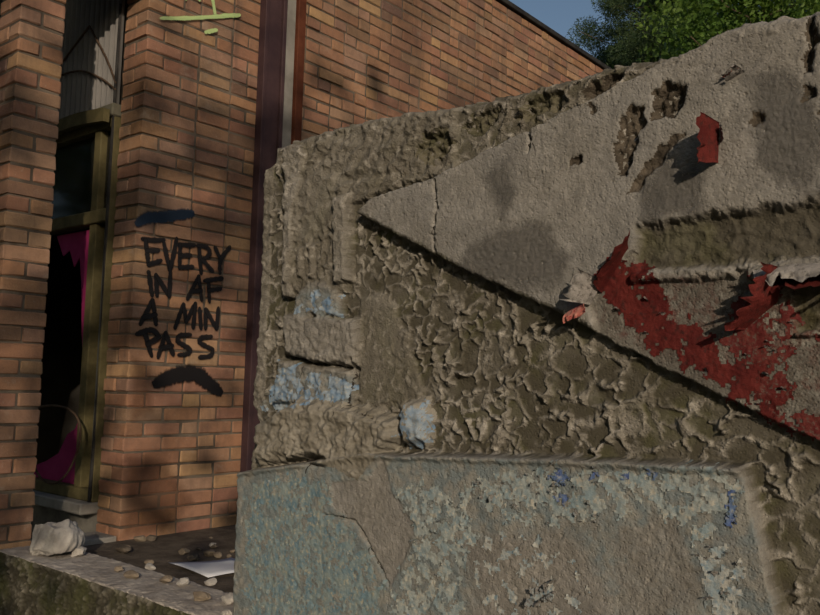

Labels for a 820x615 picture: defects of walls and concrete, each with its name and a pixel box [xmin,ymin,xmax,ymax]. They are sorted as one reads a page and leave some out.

spalling [613,80,687,194]
peeling [696,112,724,163]
spalling [749,111,767,127]
crack [289,356,373,419]
peeling [560,231,820,441]
peeling [240,459,746,615]